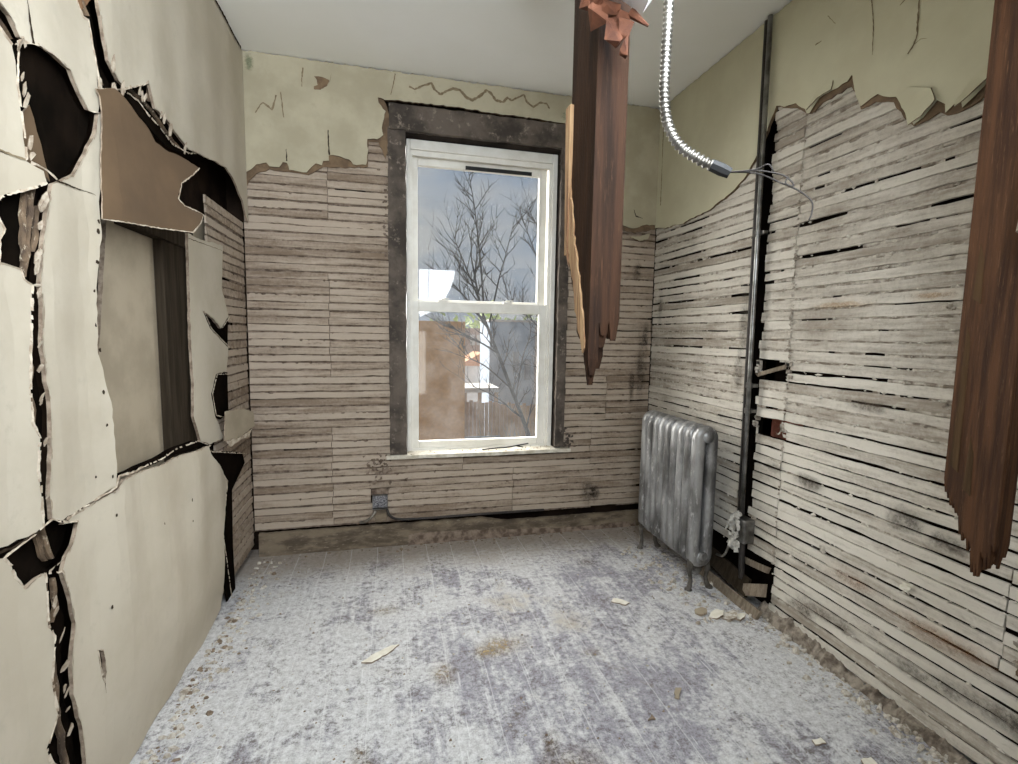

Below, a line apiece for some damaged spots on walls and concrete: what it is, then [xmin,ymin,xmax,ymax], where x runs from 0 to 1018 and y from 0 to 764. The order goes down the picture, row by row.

crack [27,0,36,46]
crack [215,0,241,48]
crack [900,0,925,54]
crack [391,74,550,109]
flaking render [806,80,833,110]
flaking render [896,87,935,125]
flaking render [954,62,988,107]
crack [0,149,26,160]
crack [56,180,95,195]
crack [0,529,40,554]